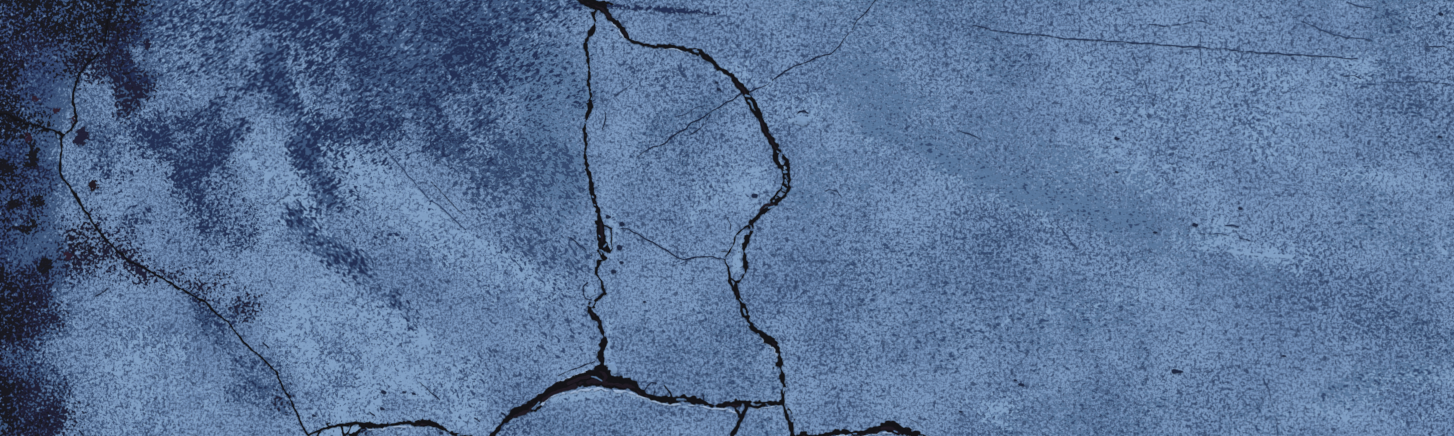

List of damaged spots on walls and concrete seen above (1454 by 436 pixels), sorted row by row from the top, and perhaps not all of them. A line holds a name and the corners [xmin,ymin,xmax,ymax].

crack [0,0,926,436]